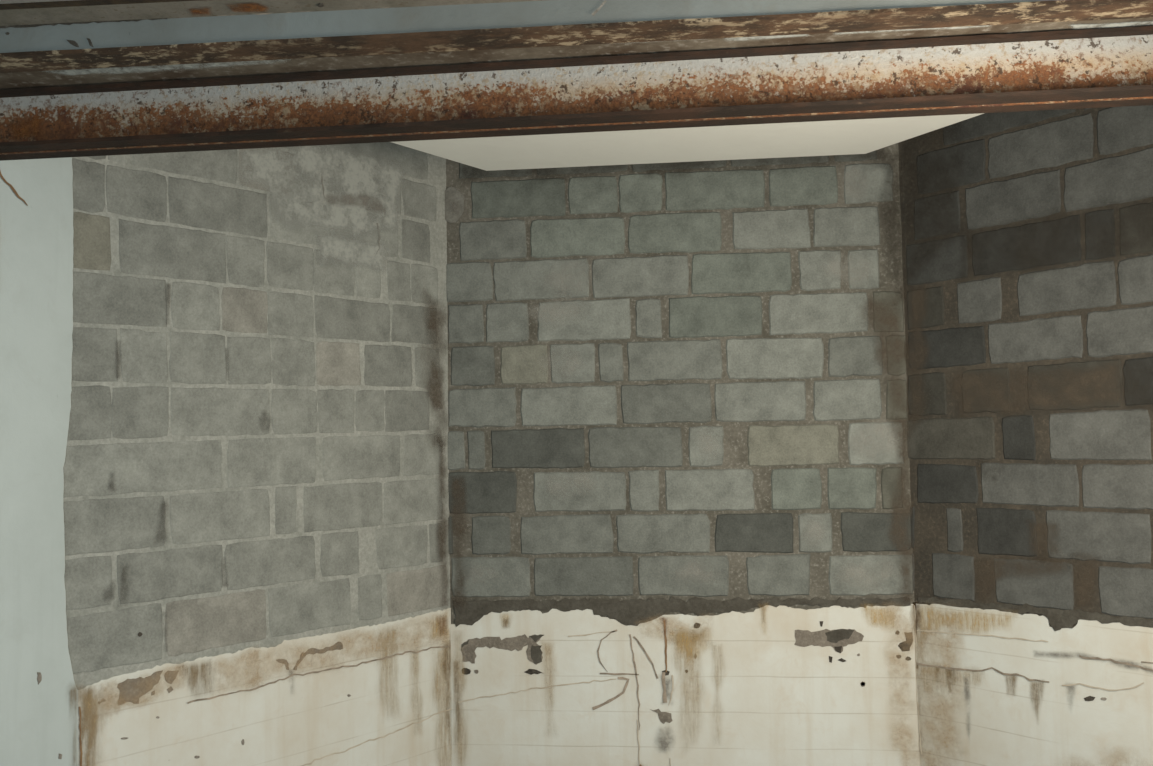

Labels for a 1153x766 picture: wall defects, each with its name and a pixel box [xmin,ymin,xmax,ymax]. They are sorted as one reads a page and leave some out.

peeling [98,670,179,705]
water stain [190,665,207,685]
crack [187,642,451,704]
crack [301,620,674,766]
spalling [461,634,544,675]
spalling [794,621,864,663]
peeling [895,630,1144,708]
water stain [71,688,97,766]